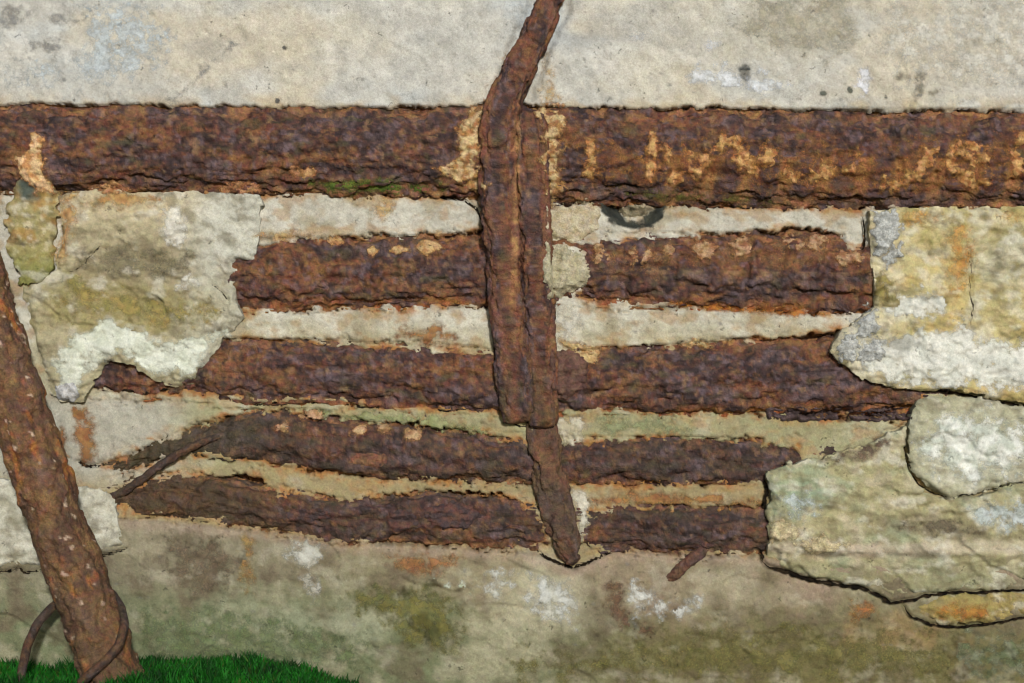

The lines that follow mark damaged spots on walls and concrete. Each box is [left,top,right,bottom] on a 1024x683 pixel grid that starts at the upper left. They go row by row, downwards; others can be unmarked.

spalling [599,203,666,229]
peeling [870,208,905,270]
corrosion [396,325,456,349]
peeling [837,302,886,364]
corrosion [549,348,590,401]
corrosion [765,406,912,423]
corrosion [60,407,96,463]
peeling [768,519,851,555]
corrosion [666,546,707,582]
efflorescence [485,571,511,598]
efflorescence [524,572,578,622]
efflorescence [628,578,702,618]